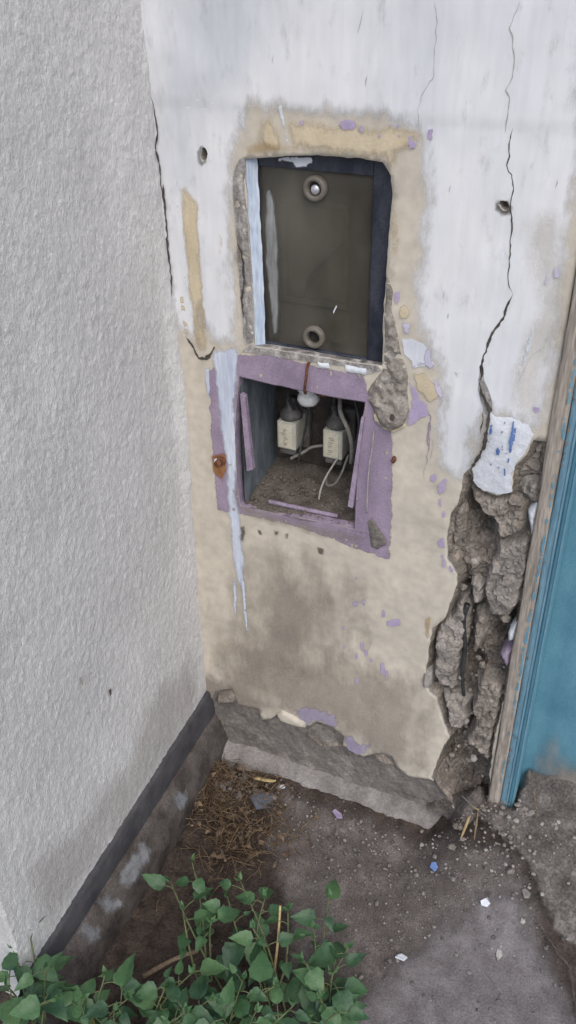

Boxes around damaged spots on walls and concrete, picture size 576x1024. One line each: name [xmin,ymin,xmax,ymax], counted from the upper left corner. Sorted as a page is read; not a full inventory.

crack [151,98,172,293]
crack [471,5,519,469]
crack [186,337,215,360]
rust [212,454,226,478]
flaking render [212,418,569,806]